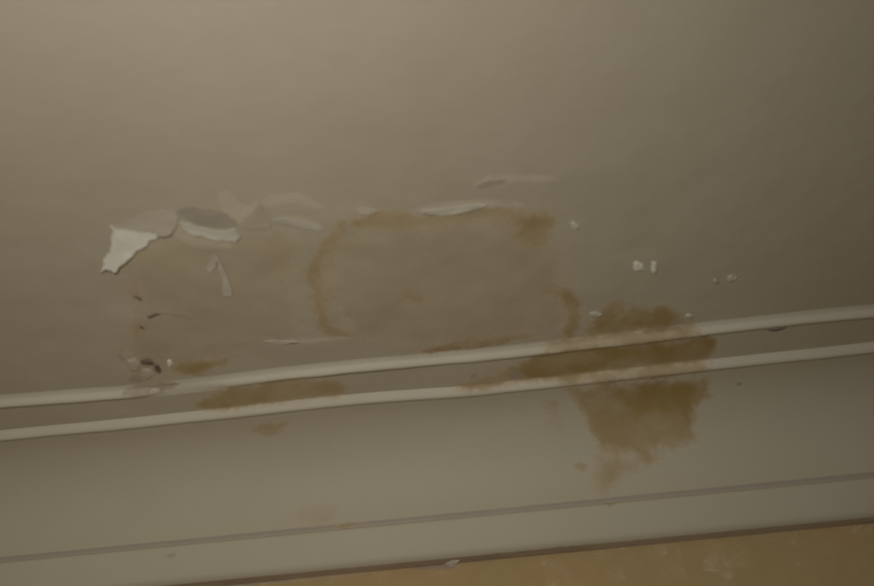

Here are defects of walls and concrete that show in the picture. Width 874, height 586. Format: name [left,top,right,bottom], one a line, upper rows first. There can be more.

peeling [101,207,241,297]
water stain [197,381,343,409]
water stain [502,287,717,481]